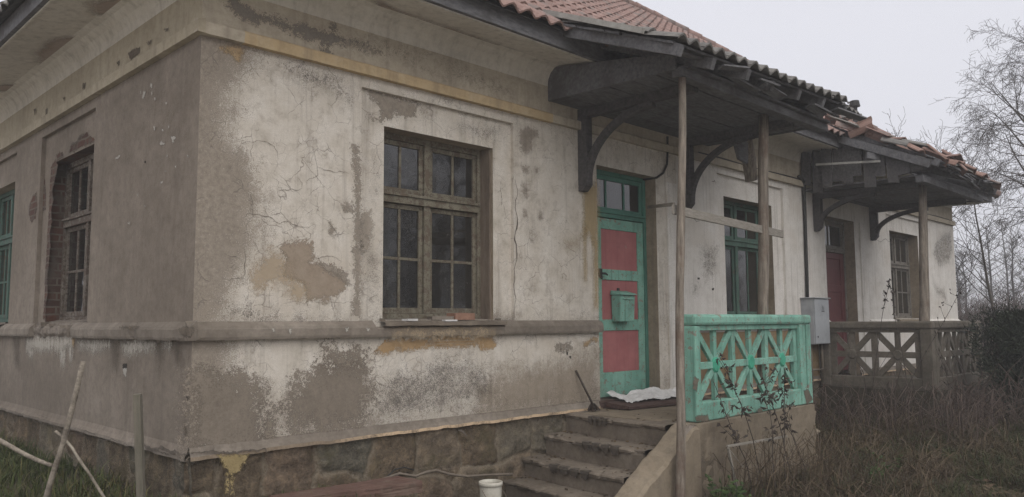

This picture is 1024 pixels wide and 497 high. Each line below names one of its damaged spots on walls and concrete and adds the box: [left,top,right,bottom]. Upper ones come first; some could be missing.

peeling [226,0,381,55]
peeling [366,89,421,123]
crack [244,140,349,261]
peeling [249,144,383,331]
crack [500,181,518,317]
damp [26,335,172,366]
peeling [373,326,496,357]
damp [169,338,489,495]